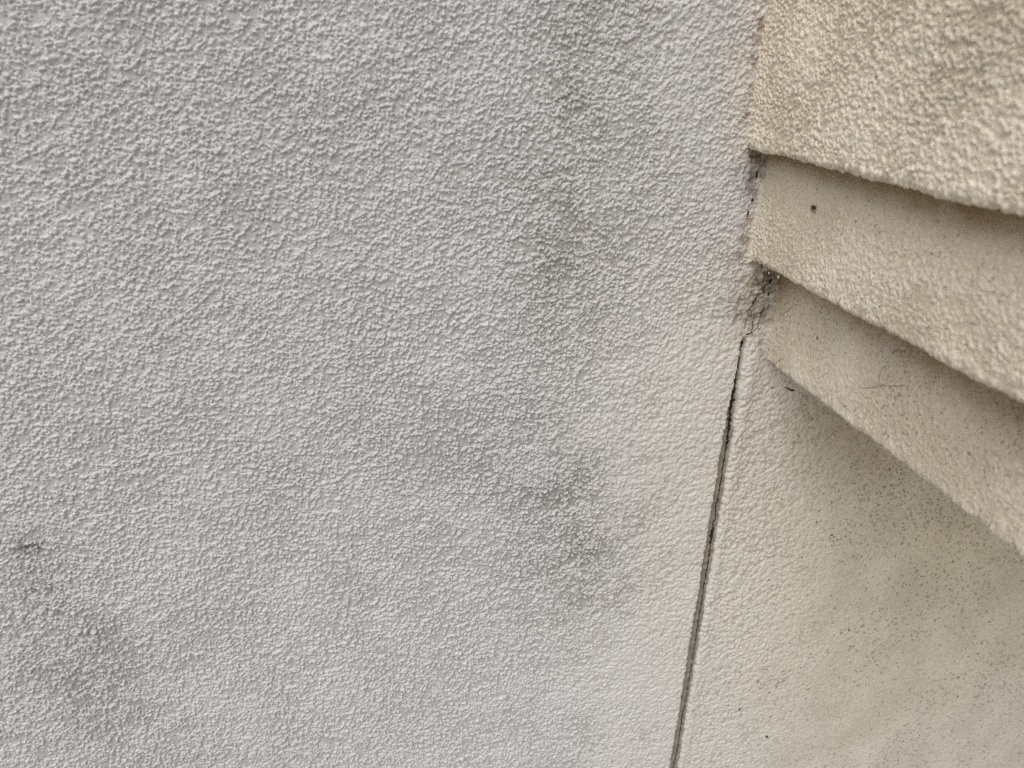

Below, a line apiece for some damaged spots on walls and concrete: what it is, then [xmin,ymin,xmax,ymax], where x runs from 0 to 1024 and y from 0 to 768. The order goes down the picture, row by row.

crack [673,283,794,768]